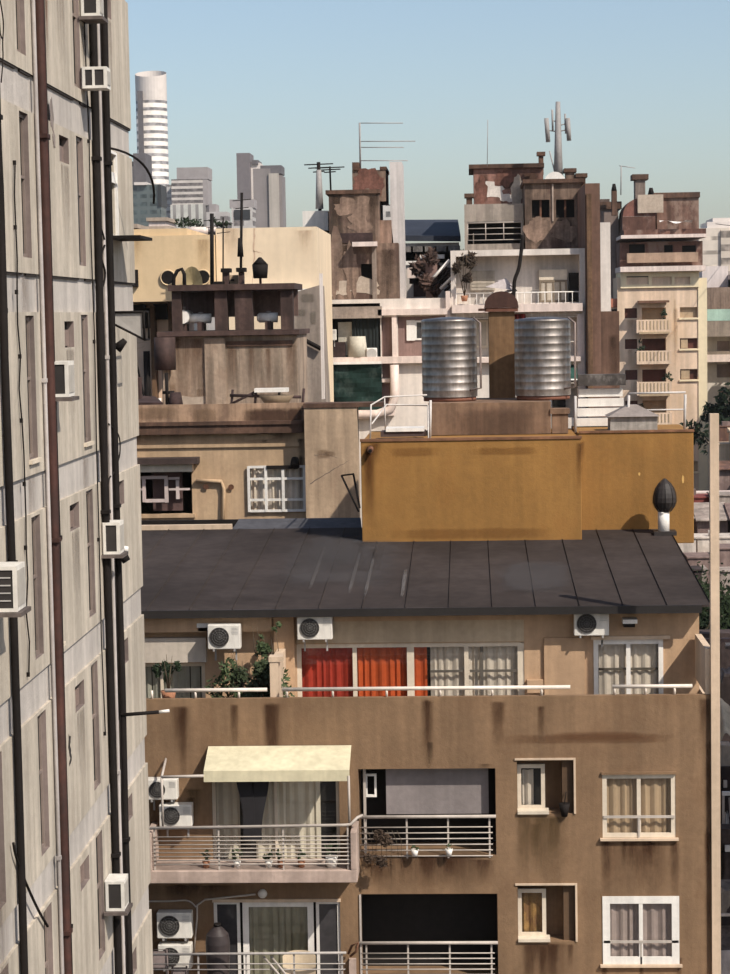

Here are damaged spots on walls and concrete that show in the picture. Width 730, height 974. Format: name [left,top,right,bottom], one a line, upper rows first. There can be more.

peeling [474,169,522,204]
spalling [522,216,577,243]